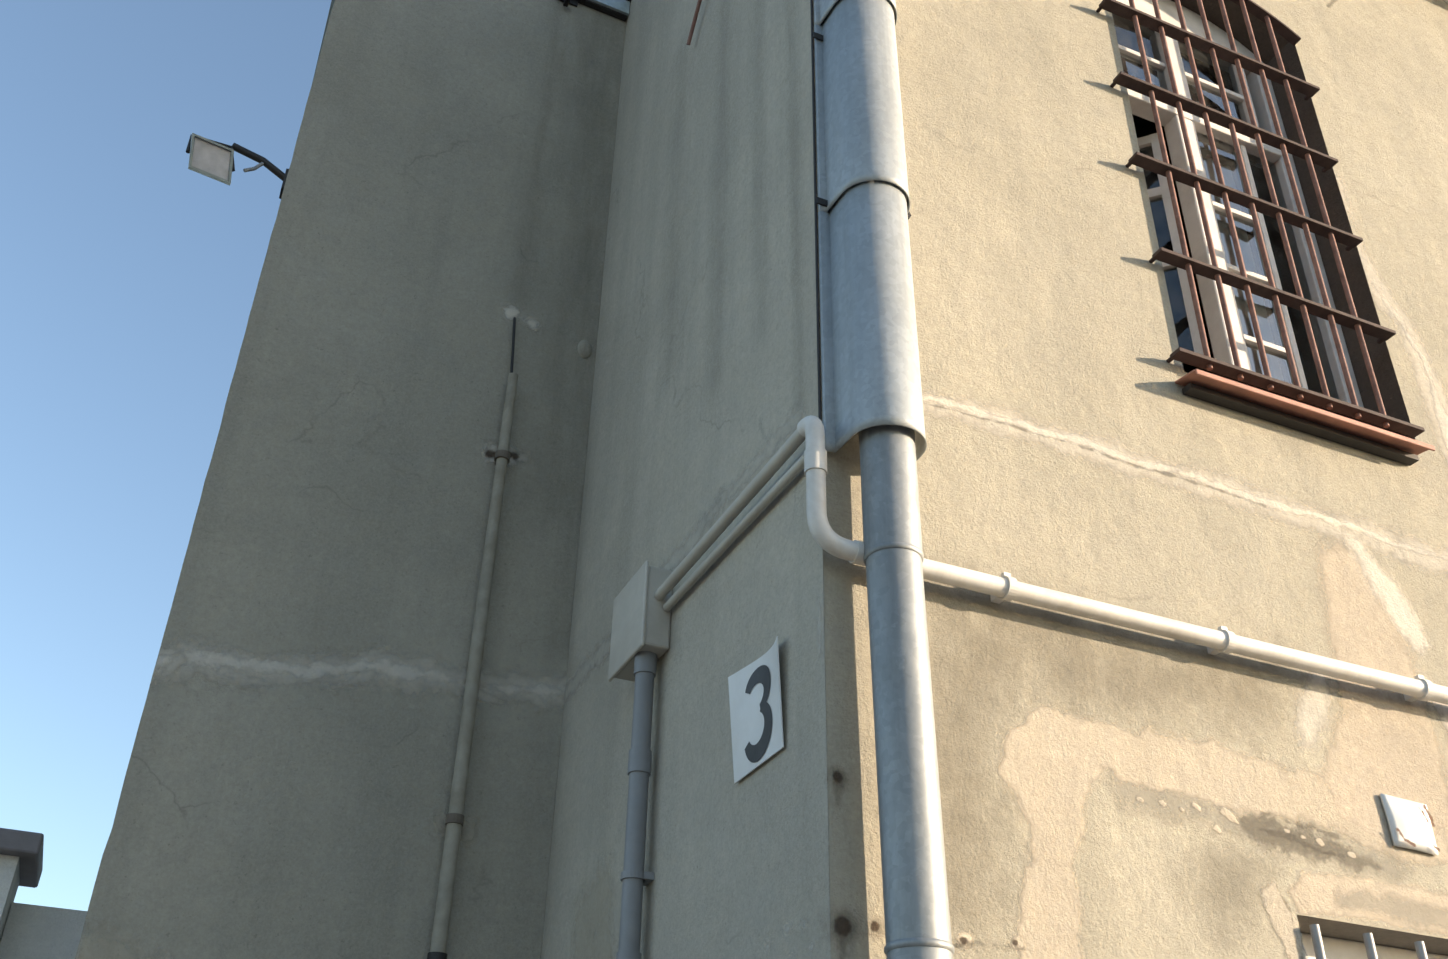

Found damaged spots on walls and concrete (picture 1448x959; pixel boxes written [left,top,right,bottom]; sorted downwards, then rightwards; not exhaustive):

crack [1336,178,1448,461]
crack [922,393,1448,729]
crack [154,642,566,707]
peeling [1212,807,1239,834]
rust [835,917,851,936]
flaking render [1261,883,1307,959]